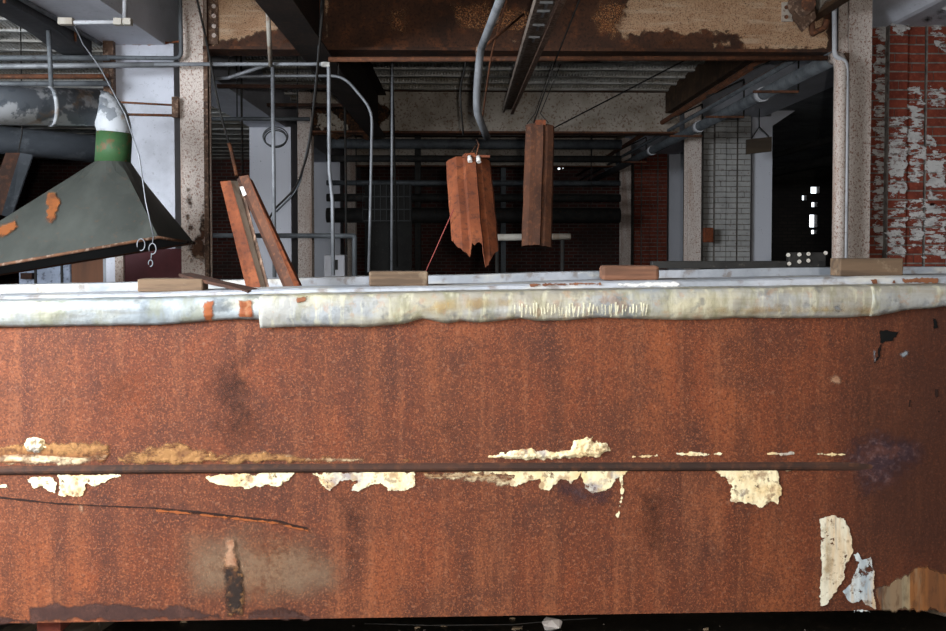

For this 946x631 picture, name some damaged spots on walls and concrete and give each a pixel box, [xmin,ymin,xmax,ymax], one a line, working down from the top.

peeling [614,0,828,49]
peeling [871,23,946,259]
corrosion [0,153,20,235]
corrosion [46,192,60,223]
corrosion [203,301,214,321]
corrosion [239,300,253,317]
crack [0,497,308,530]
peeling [0,437,628,517]
peeling [716,470,782,508]
corrosion [224,539,244,616]
damp [197,547,326,589]
peeling [819,515,876,612]